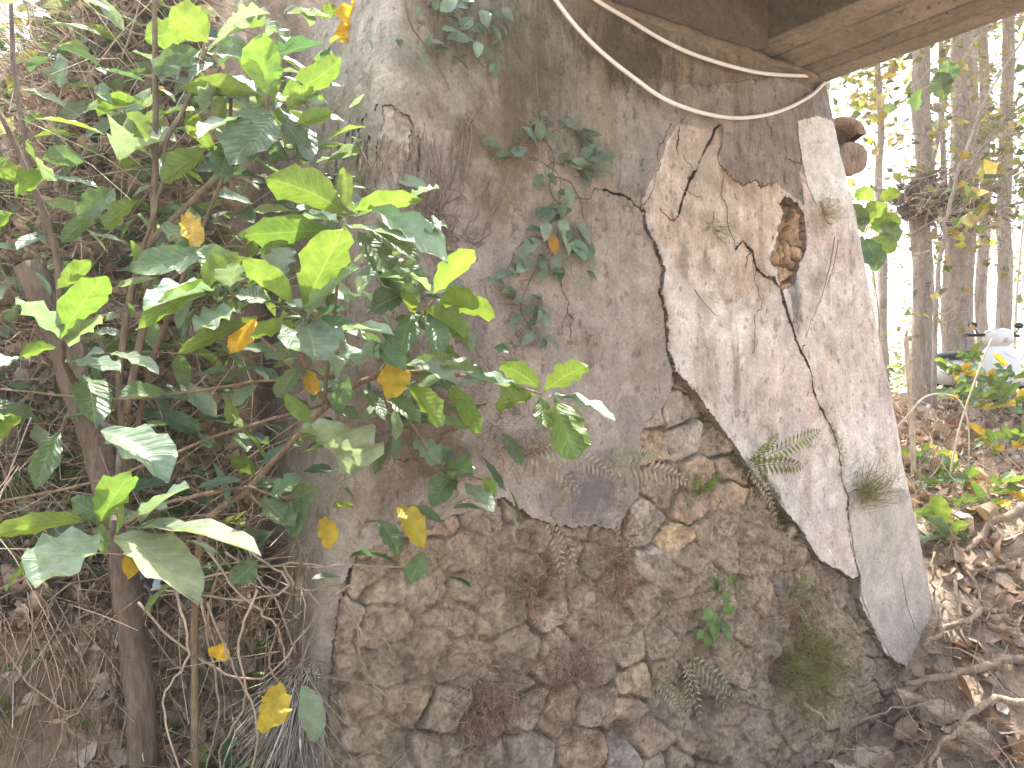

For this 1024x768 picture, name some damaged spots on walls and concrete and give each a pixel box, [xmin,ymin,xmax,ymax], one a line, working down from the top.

crack [534,115,783,353]
flaking render [770,192,803,289]
flaking render [326,376,903,768]